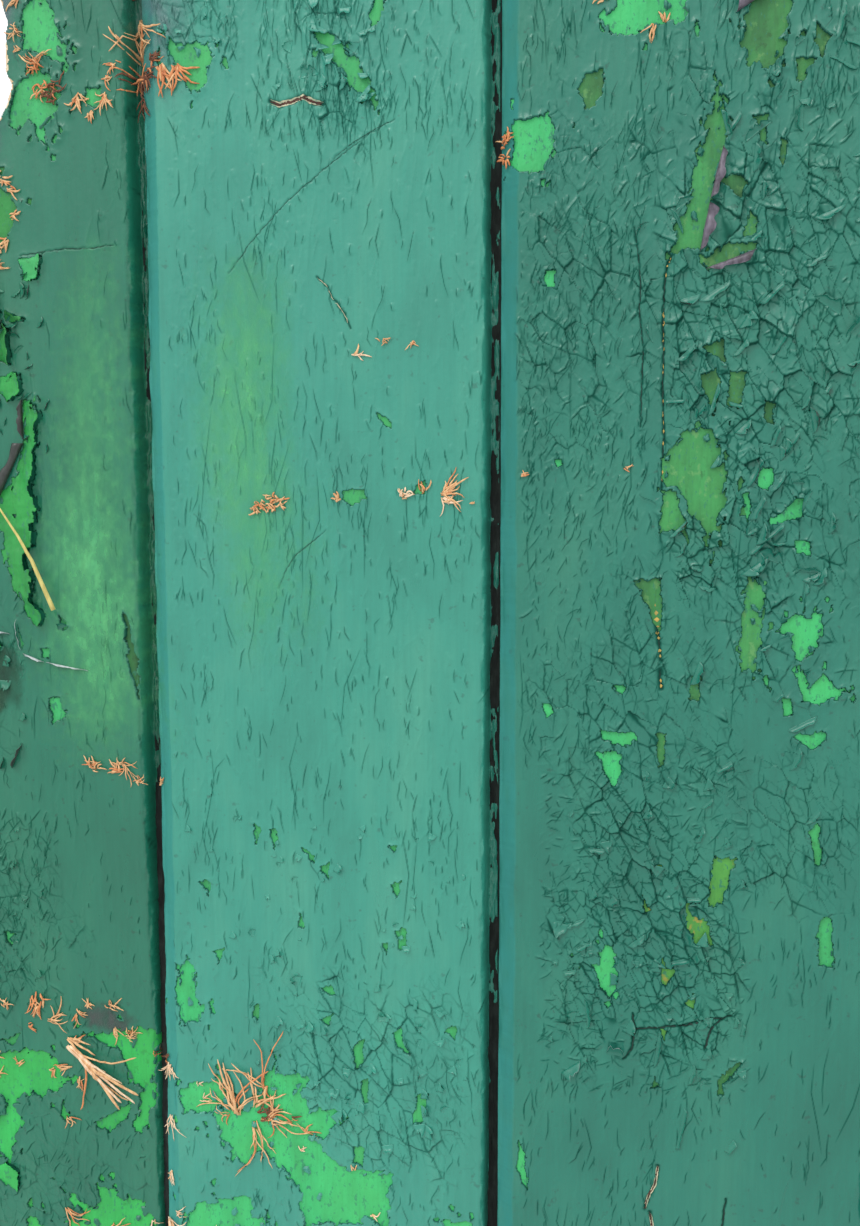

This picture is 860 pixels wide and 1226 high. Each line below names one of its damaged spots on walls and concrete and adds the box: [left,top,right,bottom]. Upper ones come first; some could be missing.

peeling [599,0,700,50]
crack [270,94,324,108]
peeling [504,99,556,187]
peeling [0,167,32,242]
crack [635,233,671,474]
peeling [0,310,87,691]
crack [654,604,662,688]
peeling [0,1033,78,1192]
peeling [74,1015,162,1133]
peeling [174,1039,393,1226]
crack [623,1014,727,1059]
peeling [53,1172,157,1226]